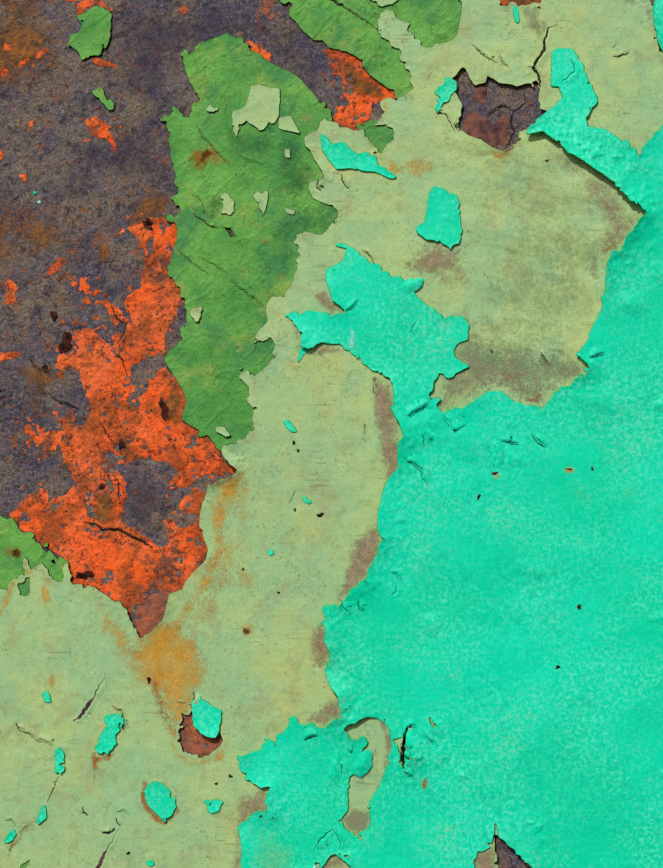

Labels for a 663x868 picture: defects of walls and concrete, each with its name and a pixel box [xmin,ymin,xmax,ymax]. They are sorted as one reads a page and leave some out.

corrosion [58,332,73,354]
peeling [0,0,405,649]
corrosion [158,378,184,424]
corrosion [114,434,134,459]
peeling [236,0,663,868]
corrosion [198,475,241,595]
corrosion [75,571,95,580]
corrosion [135,590,223,762]
peeling [94,713,127,755]
peeling [191,696,222,748]
peeling [55,747,65,774]
peeling [143,781,177,822]